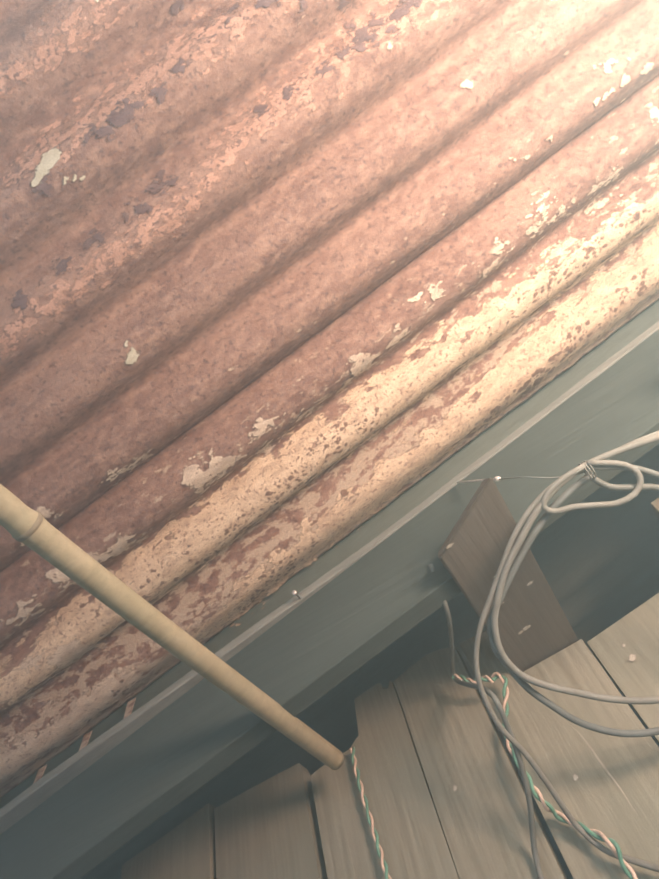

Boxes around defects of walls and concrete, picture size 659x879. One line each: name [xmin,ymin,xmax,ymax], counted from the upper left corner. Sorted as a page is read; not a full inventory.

peeling [593,62,655,106]
peeling [31,148,62,187]
peeling [477,164,624,283]
peeling [408,281,446,303]
peeling [124,340,139,364]
peeling [337,323,410,392]
spalling [477,265,659,429]
peeling [181,402,320,495]
leakage [114,175,659,643]
peeling [45,568,77,590]
leakage [0,590,126,711]
peeling [0,665,151,782]